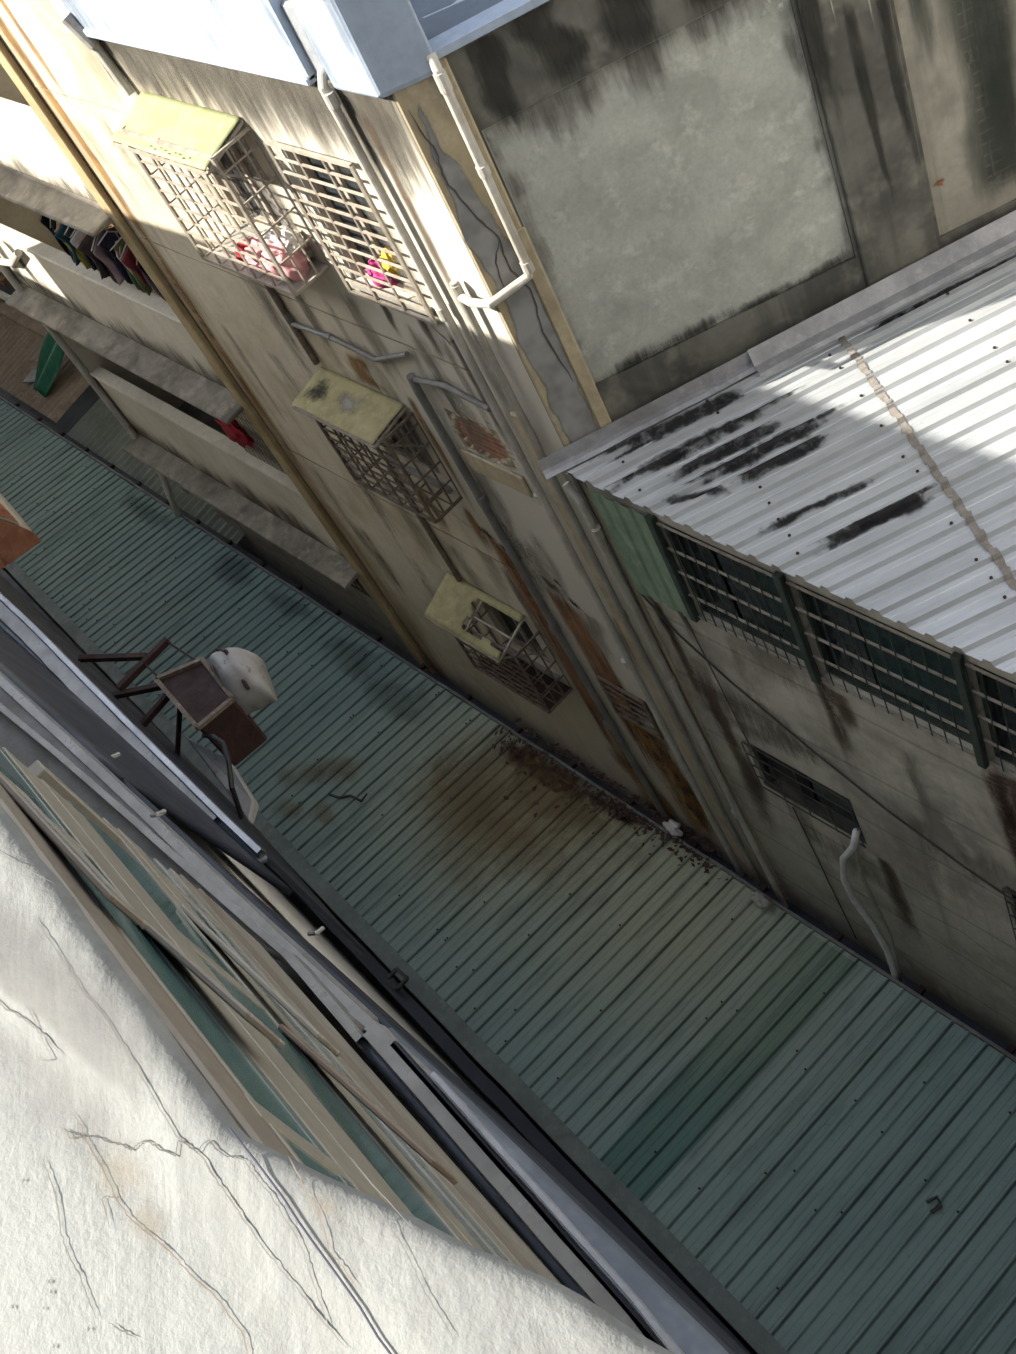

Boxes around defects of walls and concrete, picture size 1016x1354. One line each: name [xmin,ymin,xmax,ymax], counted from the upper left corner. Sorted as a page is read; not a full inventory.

leakage [468,4,597,129]
leakage [0,0,291,452]
leakage [95,39,450,283]
crack [408,110,573,381]
leakage [605,390,835,504]
leakage [762,483,867,533]
leakage [826,486,933,550]
rust [465,510,711,839]
crack [0,1002,61,1061]
crack [41,1155,135,1337]
crack [63,1112,357,1352]
crack [351,1158,453,1337]